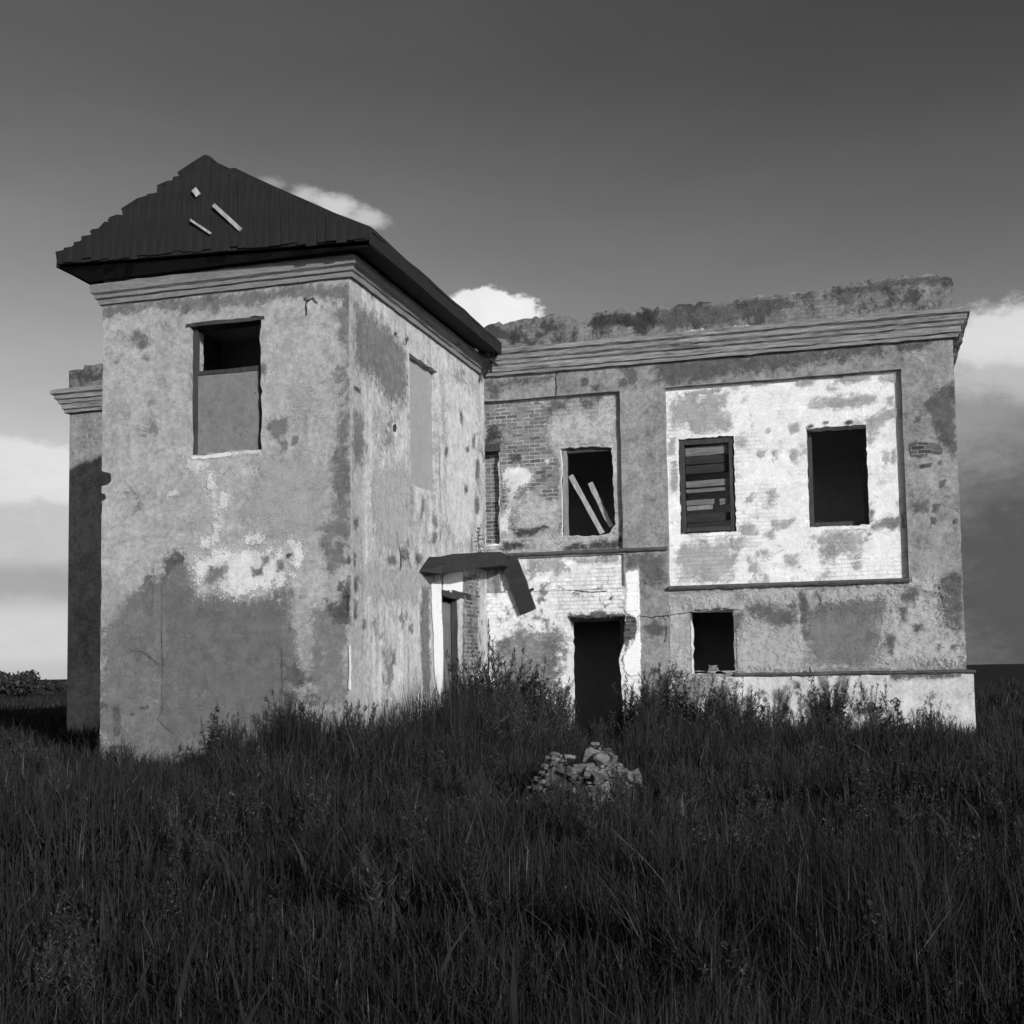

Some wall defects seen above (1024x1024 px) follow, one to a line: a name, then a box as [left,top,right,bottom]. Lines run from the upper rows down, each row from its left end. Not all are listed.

damp [656,298,794,332]
damp [838,276,950,304]
damp [102,281,408,576]
peeling [440,365,560,552]
peeling [810,392,899,443]
flaking render [910,441,943,468]
peeling [869,510,906,535]
flaking render [165,529,309,603]
crack [132,589,163,680]
damp [100,548,309,769]
flaking render [492,623,567,697]
damp [734,588,885,641]